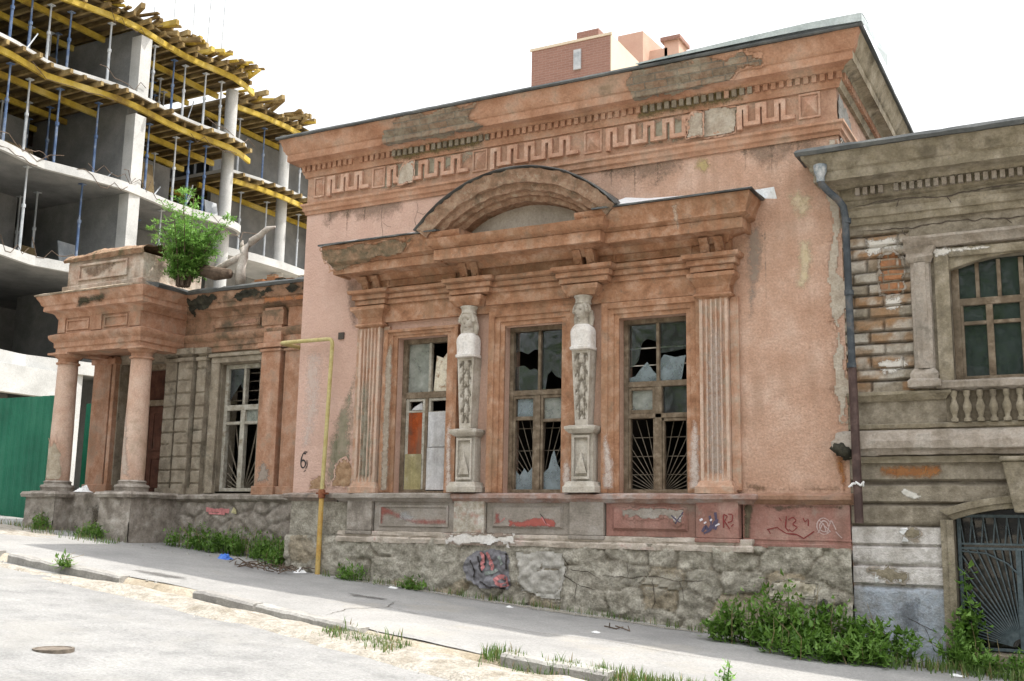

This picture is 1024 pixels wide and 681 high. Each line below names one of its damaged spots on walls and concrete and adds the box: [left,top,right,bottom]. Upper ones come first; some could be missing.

flaking render [876,250,907,299]
flaking render [823,189,849,425]
water stain [328,389,370,481]
flaking render [307,456,352,493]
crack [562,556,707,609]